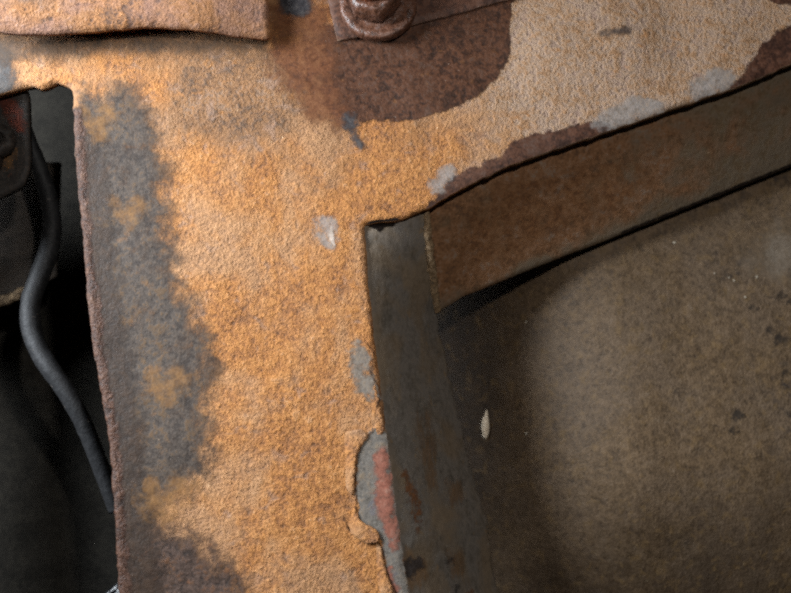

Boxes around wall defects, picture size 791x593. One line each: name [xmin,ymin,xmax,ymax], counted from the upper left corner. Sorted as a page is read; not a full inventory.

corrosion [269,0,348,127]
corrosion [730,26,791,89]
peeling [344,340,424,593]